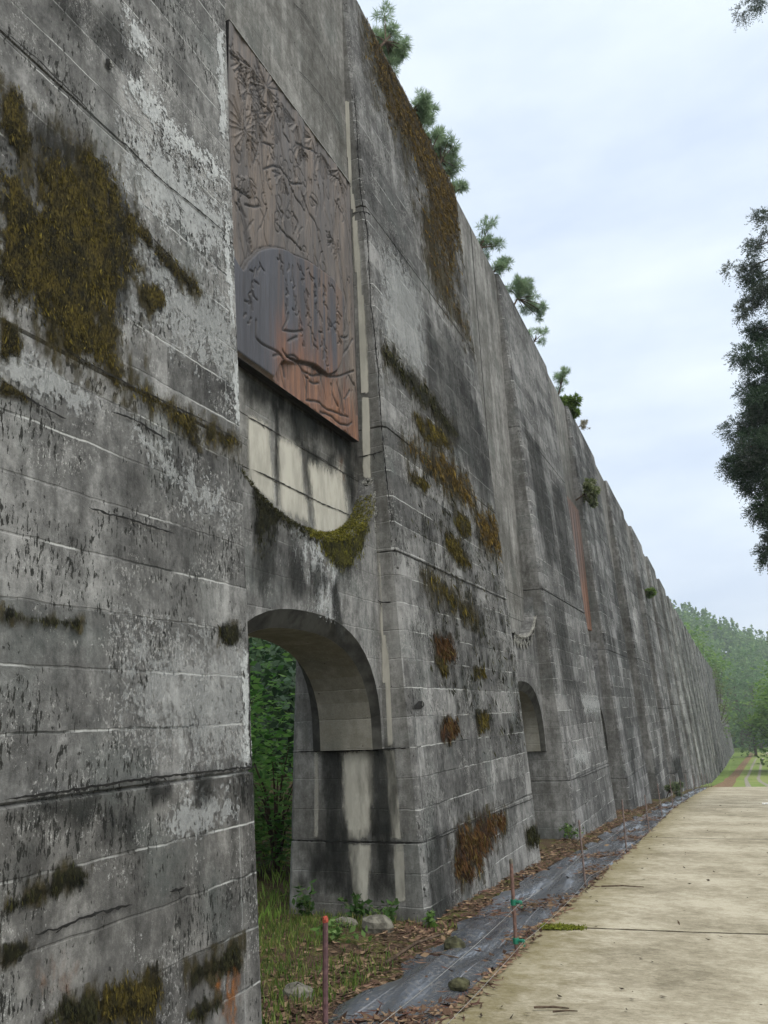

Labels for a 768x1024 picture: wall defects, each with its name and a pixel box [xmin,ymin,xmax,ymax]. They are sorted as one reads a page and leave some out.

leakage [0,73,371,532]
crack [65,1,474,520]
crack [89,507,172,533]
crack [5,638,260,800]
leakage [310,564,405,905]
crack [35,904,130,935]